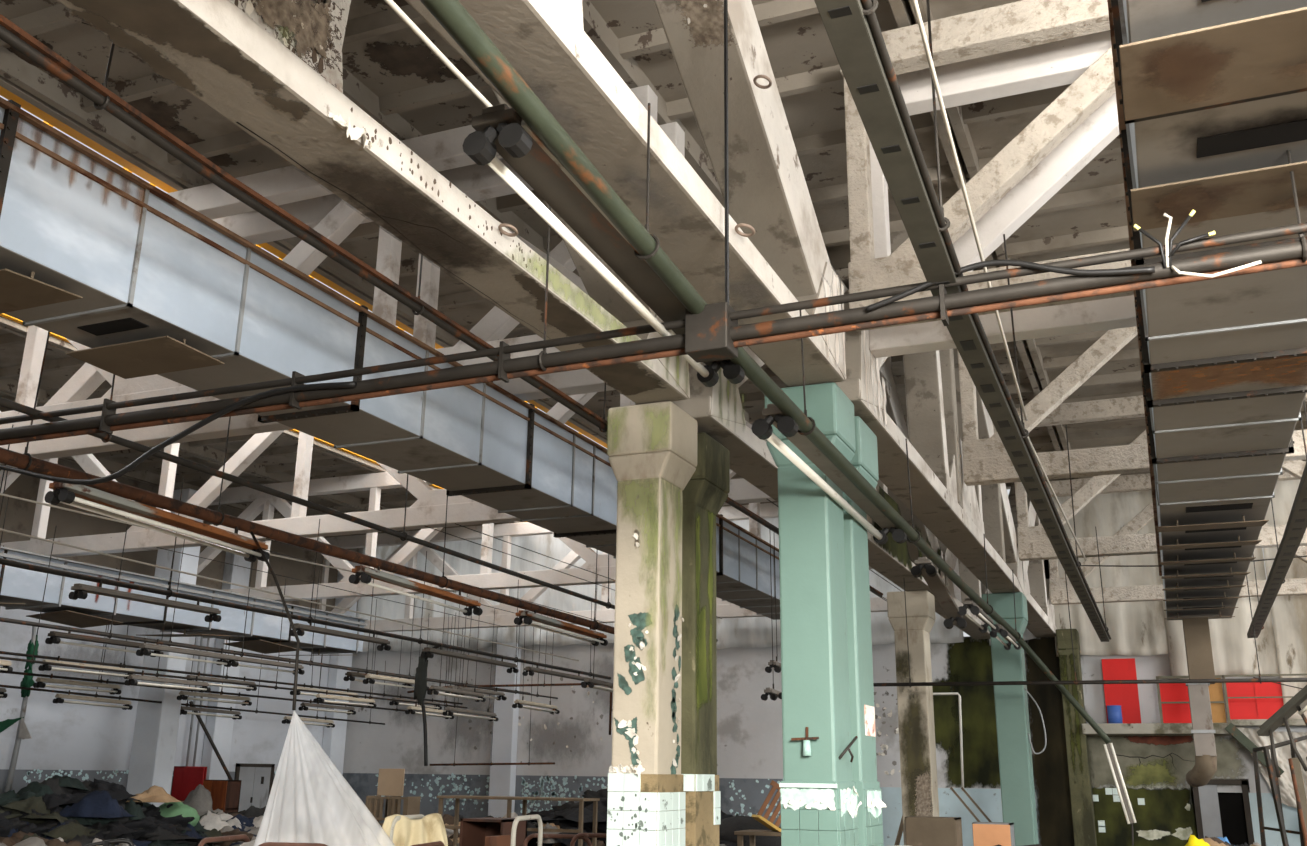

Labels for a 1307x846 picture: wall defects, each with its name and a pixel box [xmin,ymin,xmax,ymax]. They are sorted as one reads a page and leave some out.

peeling [234,0,335,74]
damp [514,274,616,348]
damp [587,356,680,395]
corrosion [1156,356,1307,398]
peeling [618,612,652,695]
peeling [670,604,684,774]
peeling [520,677,645,813]
peeling [23,769,129,783]
peeling [402,773,490,811]
spalling [613,794,648,846]
spalling [729,779,887,819]
spalling [912,771,933,817]